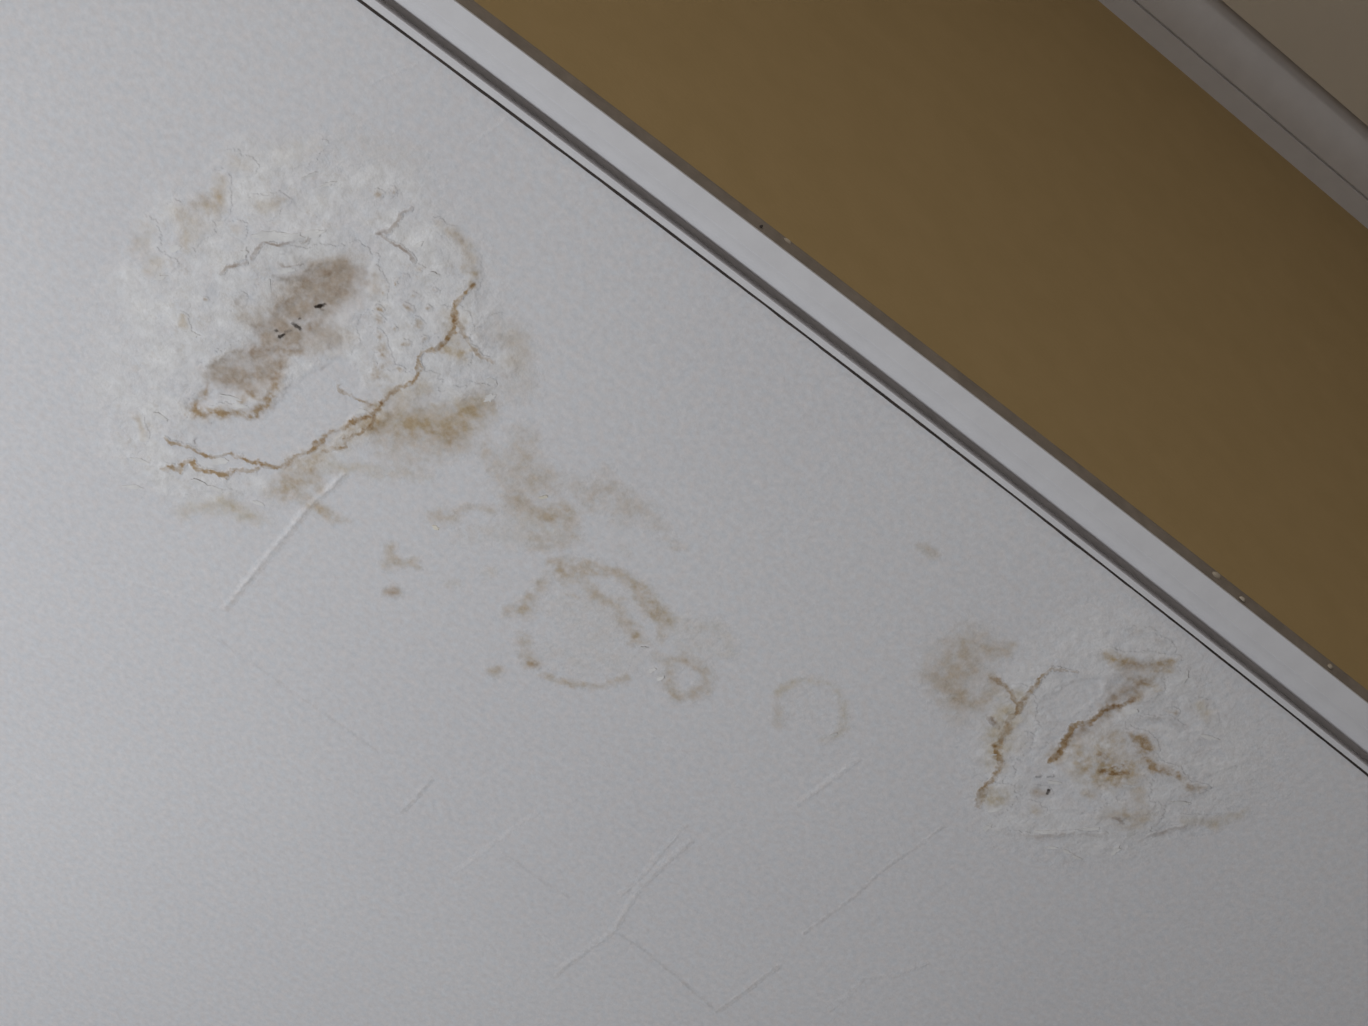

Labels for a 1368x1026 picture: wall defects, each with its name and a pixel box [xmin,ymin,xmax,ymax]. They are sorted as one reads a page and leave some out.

crack [158,206,497,480]
water stain [168,312,742,706]
crack [357,0,1368,777]
water stain [906,609,1022,734]
crack [967,666,1079,819]